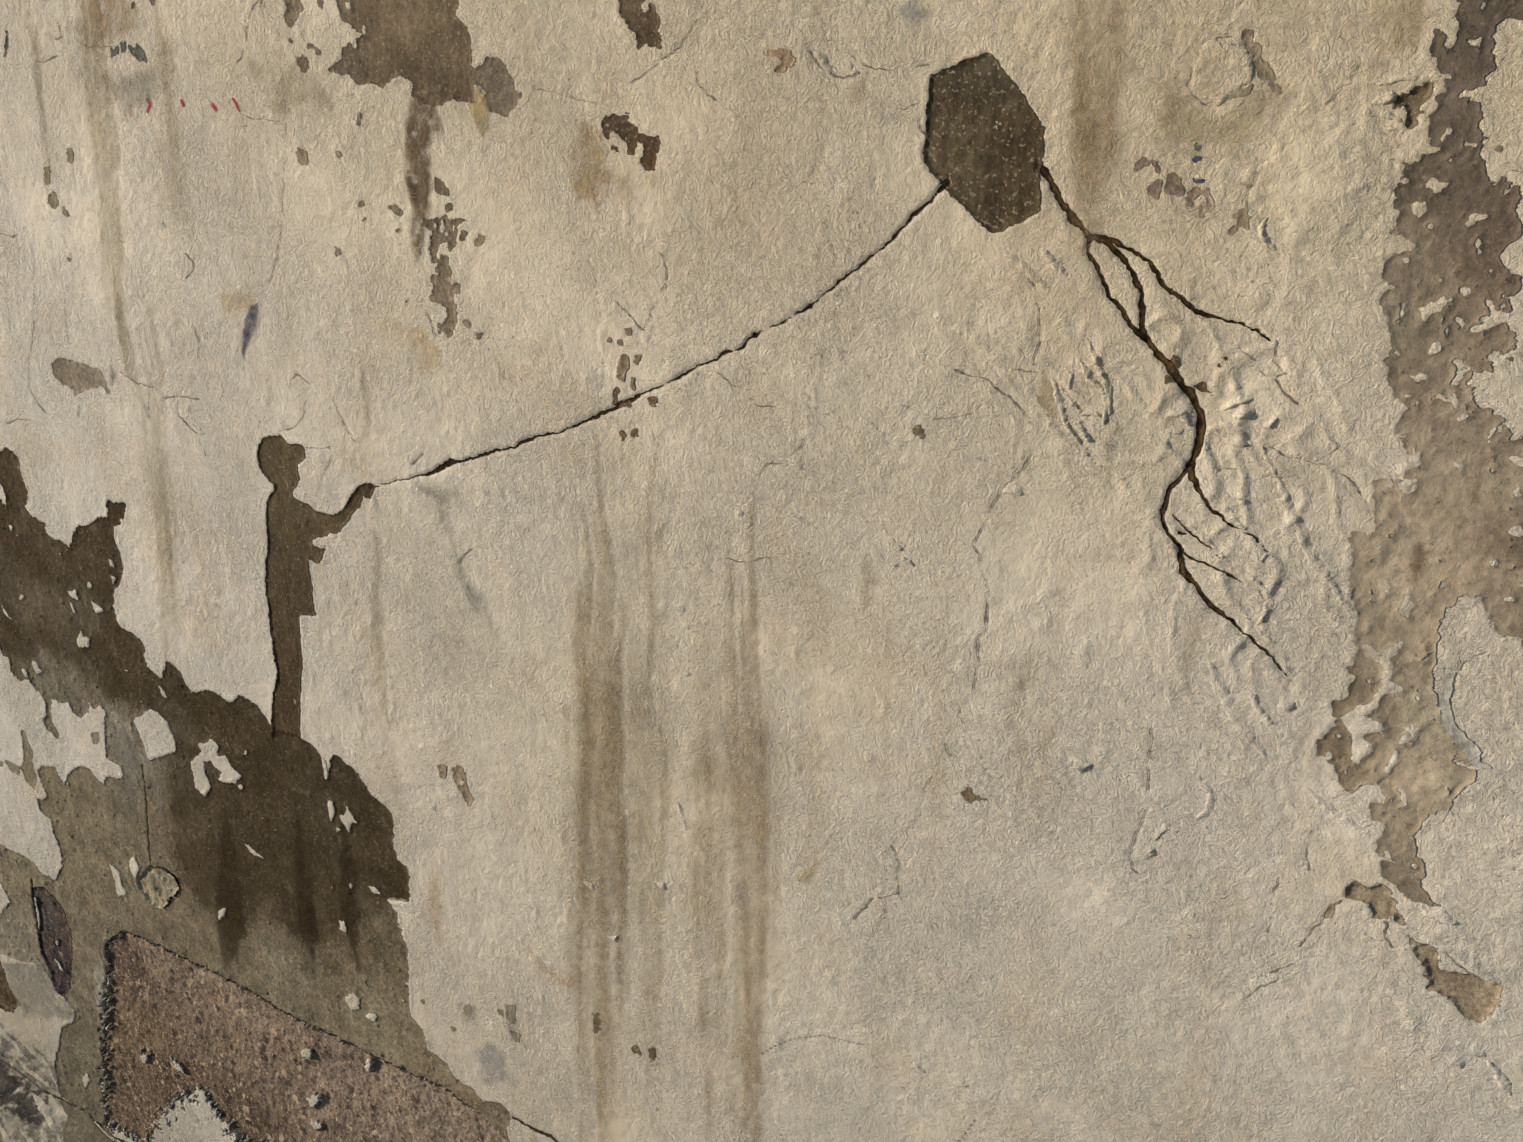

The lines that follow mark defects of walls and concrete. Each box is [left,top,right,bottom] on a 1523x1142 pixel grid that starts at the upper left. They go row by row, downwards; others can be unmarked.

peeling [283,0,521,117]
peeling [618,0,661,50]
peeling [388,205,402,232]
peeling [421,177,485,340]
crack [278,185,948,487]
peeling [601,112,660,171]
crack [1037,162,1369,682]
peeling [1315,0,1523,1023]
peeling [0,434,510,1142]
peeling [497,1003,520,1043]